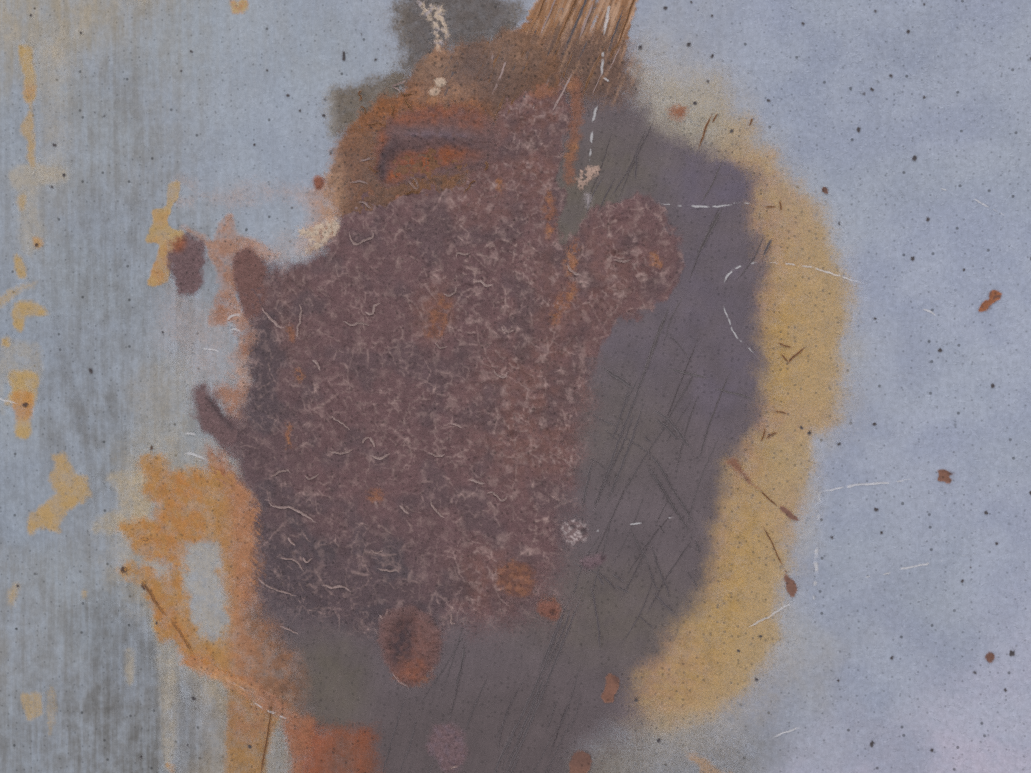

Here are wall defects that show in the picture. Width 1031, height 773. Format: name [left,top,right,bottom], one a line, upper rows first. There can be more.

rust [19,46,35,163]
water stain [328,0,525,136]
rust [13,302,44,330]
rust [119,0,849,773]
rust [28,456,86,532]